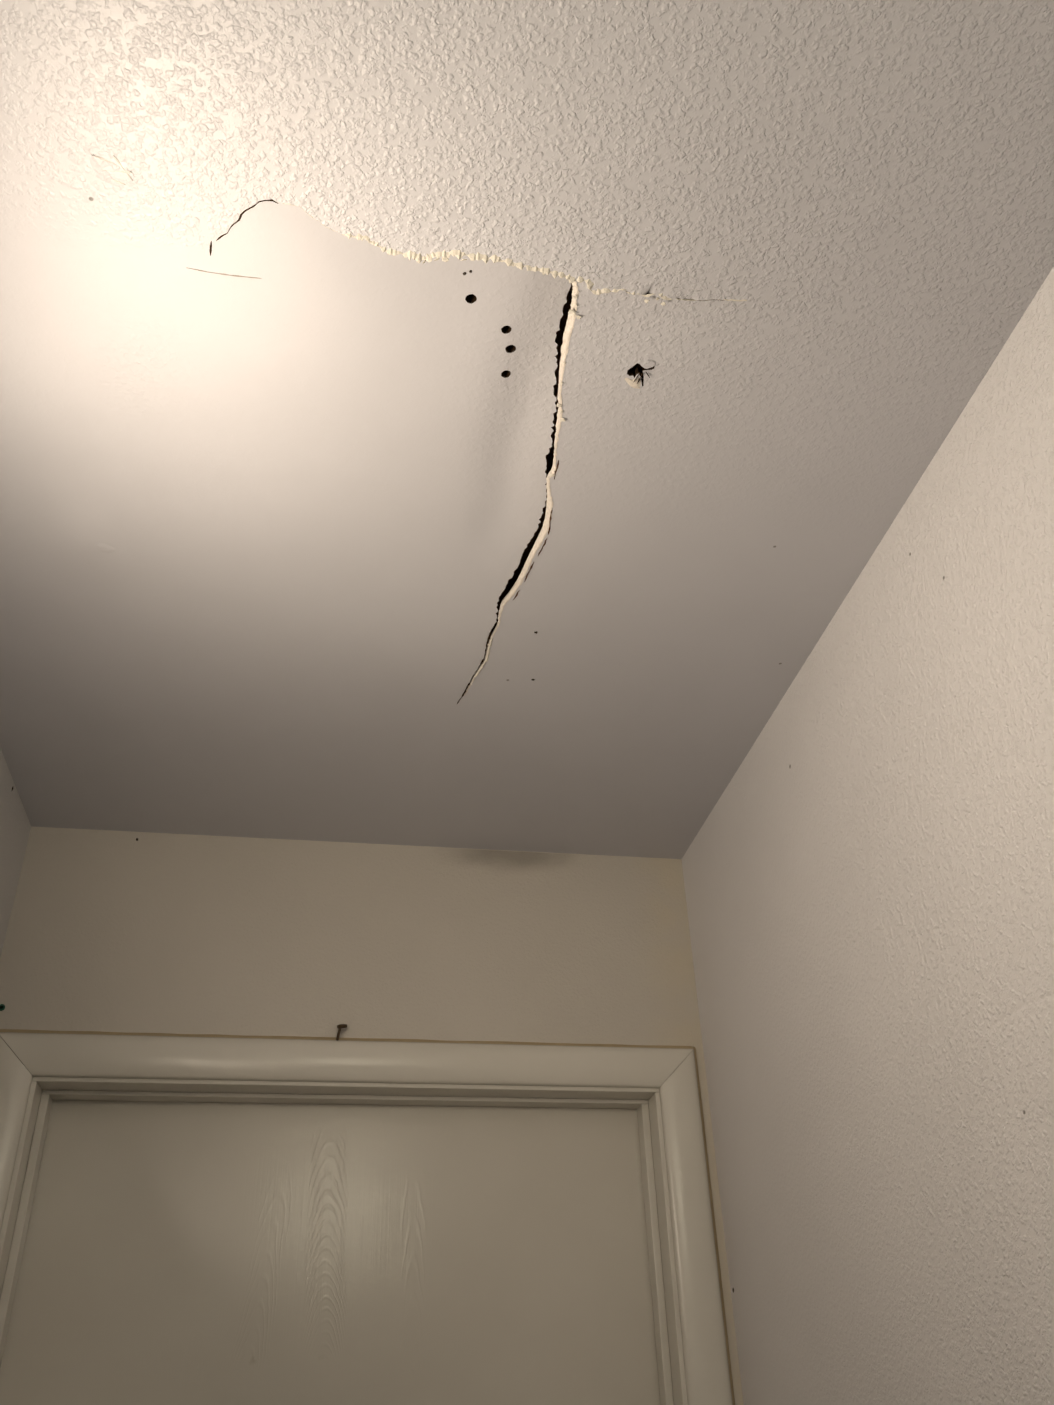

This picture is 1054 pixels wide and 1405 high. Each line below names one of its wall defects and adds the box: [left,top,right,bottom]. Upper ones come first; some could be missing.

crack [457,281,581,704]